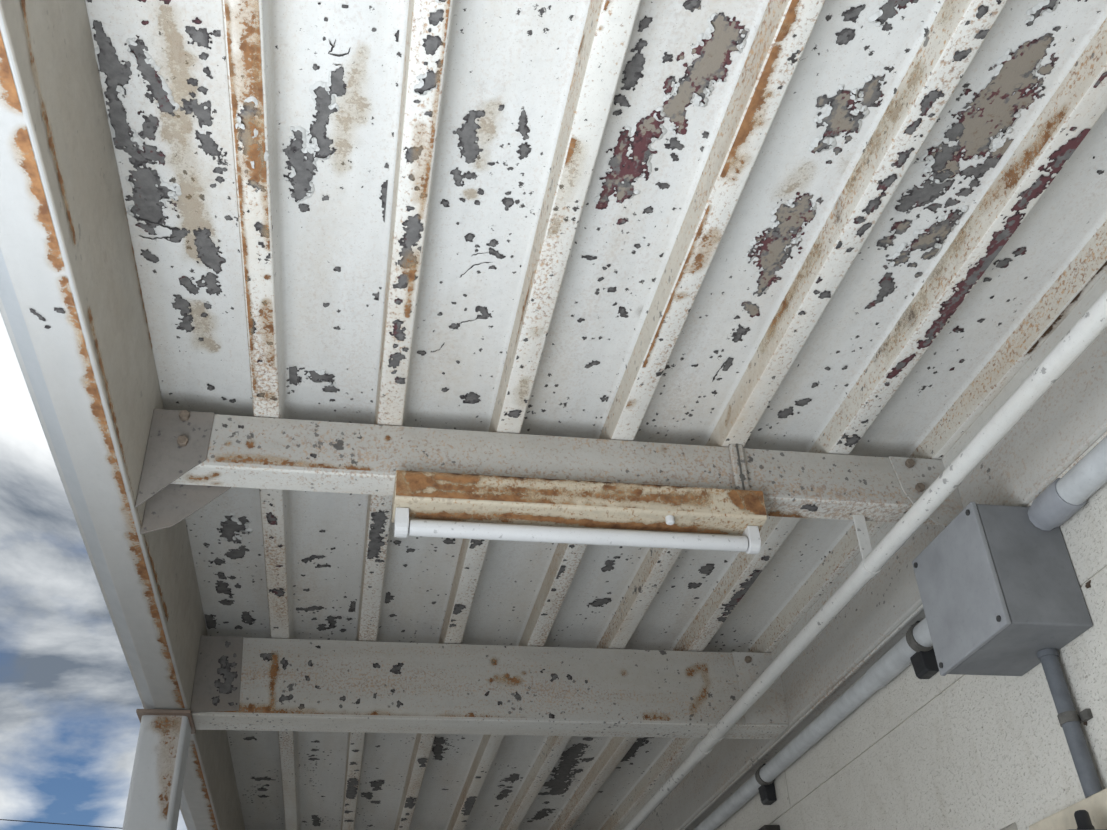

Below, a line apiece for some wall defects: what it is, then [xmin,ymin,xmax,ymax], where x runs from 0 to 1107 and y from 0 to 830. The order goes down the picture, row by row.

corrosion [0,32,22,112]
peeling [92,17,228,341]
corrosion [224,0,275,399]
peeling [283,64,346,212]
peeling [594,0,749,210]
corrosion [642,206,721,367]
corrosion [720,0,799,181]
peeling [731,192,823,343]
peeling [835,27,1061,309]
peeling [884,127,1091,386]
corrosion [14,128,185,818]
corrosion [396,470,728,534]